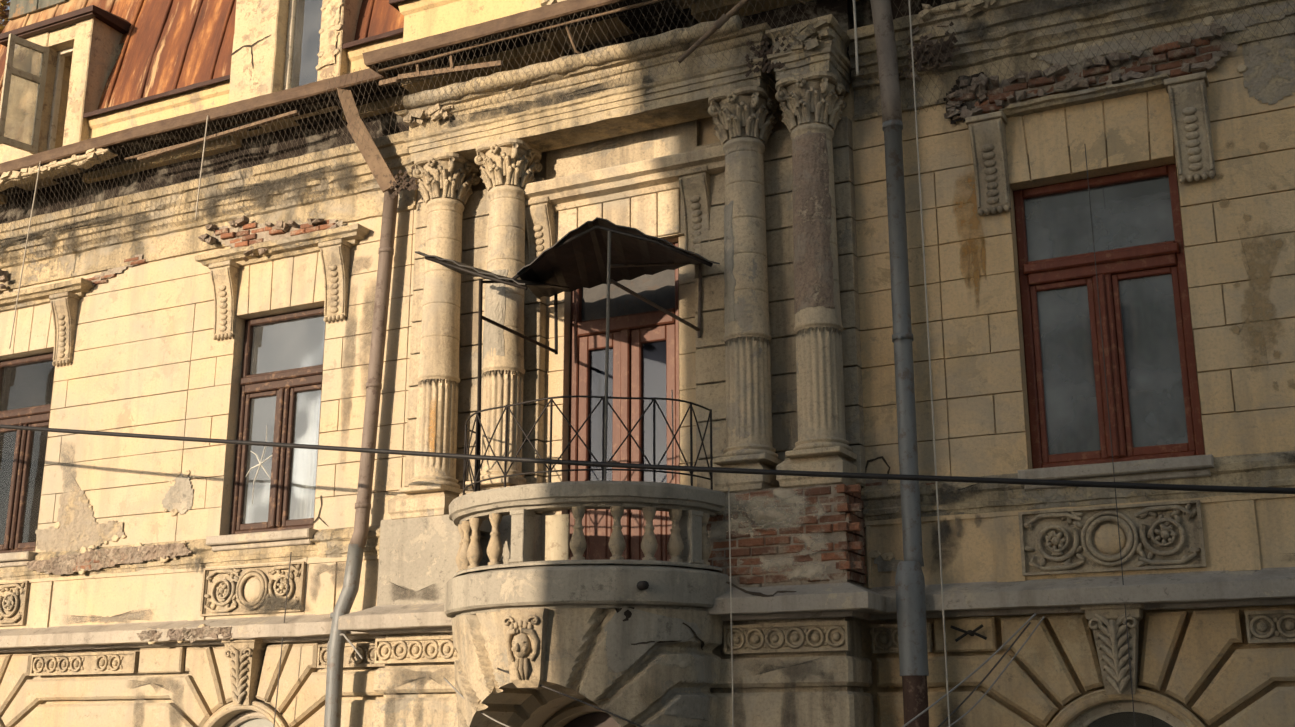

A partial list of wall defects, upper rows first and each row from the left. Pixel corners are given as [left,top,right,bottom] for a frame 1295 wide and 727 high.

spalling [919,0,997,22]
flaking render [943,0,1295,124]
flaking render [198,215,342,262]
flaking render [26,490,192,575]
flaking render [162,470,193,516]
flaking render [703,484,867,588]